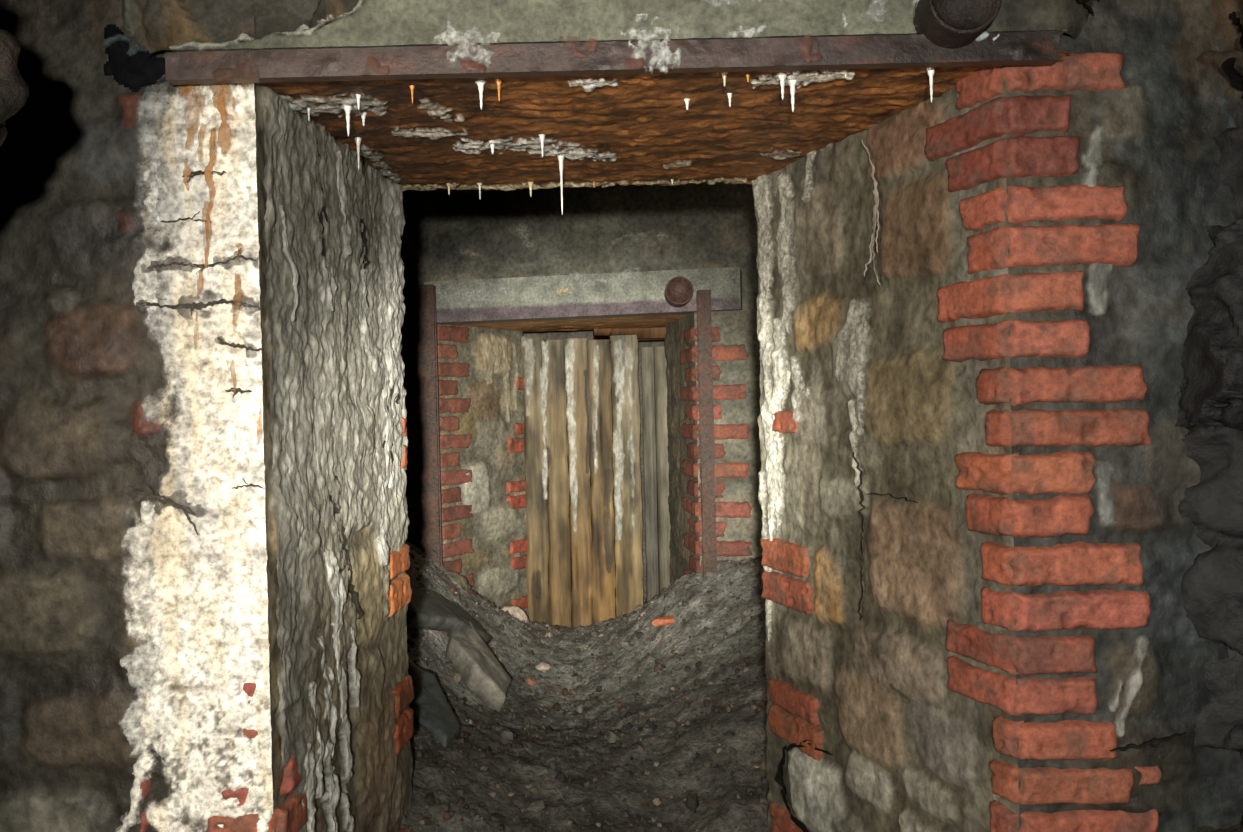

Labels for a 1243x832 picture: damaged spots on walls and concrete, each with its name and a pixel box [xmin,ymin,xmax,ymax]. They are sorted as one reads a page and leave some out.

crack [1222,12,1243,98]
rust [462,60,485,72]
water stain [575,78,617,92]
water stain [750,70,855,89]
crack [182,170,226,182]
rust [179,53,259,293]
crack [161,211,212,223]
rust [234,276,242,304]
crack [136,248,263,357]
crack [225,387,252,397]
water stain [117,83,831,832]